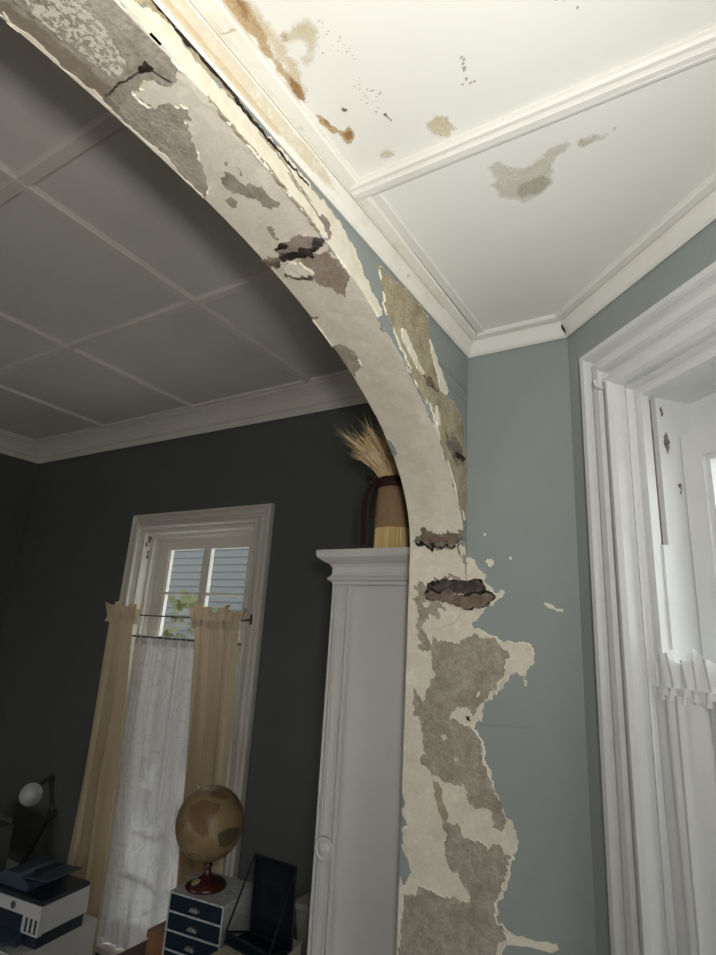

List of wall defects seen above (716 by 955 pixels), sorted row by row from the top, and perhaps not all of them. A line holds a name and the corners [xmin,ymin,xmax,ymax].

crack [105,60,172,97]
damp [167,0,279,134]
crack [151,0,323,233]
crack [189,0,444,308]
peeling [0,0,559,955]